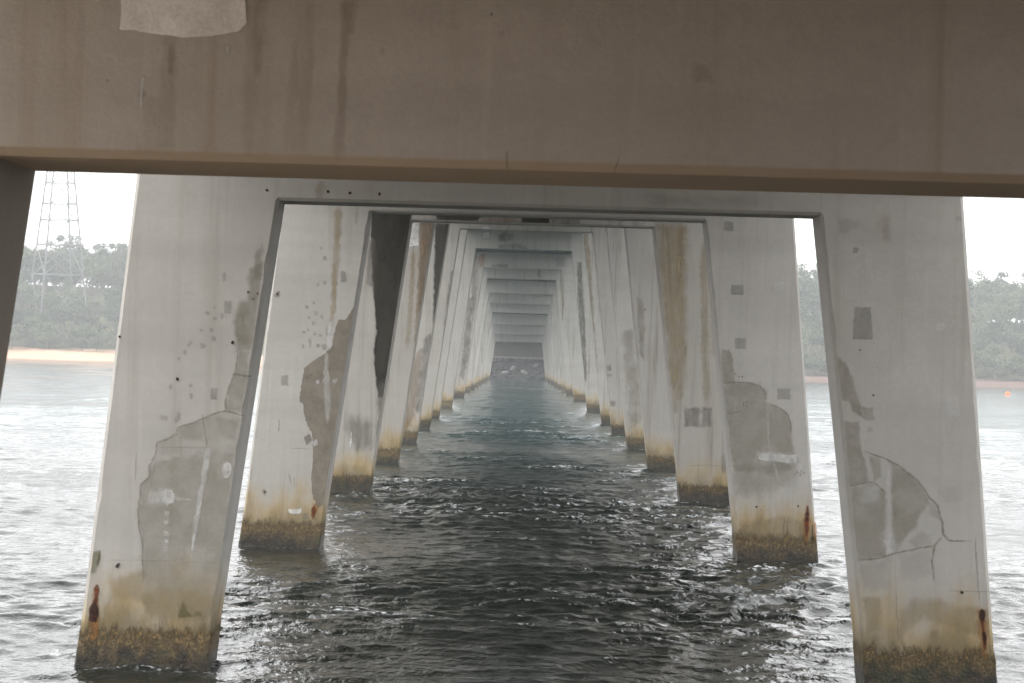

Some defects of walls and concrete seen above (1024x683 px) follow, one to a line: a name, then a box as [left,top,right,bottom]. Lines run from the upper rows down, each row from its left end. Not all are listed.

peeling [300,302,355,507]
rust [804,506,817,540]
rust [89,585,99,622]
rust [979,609,987,649]